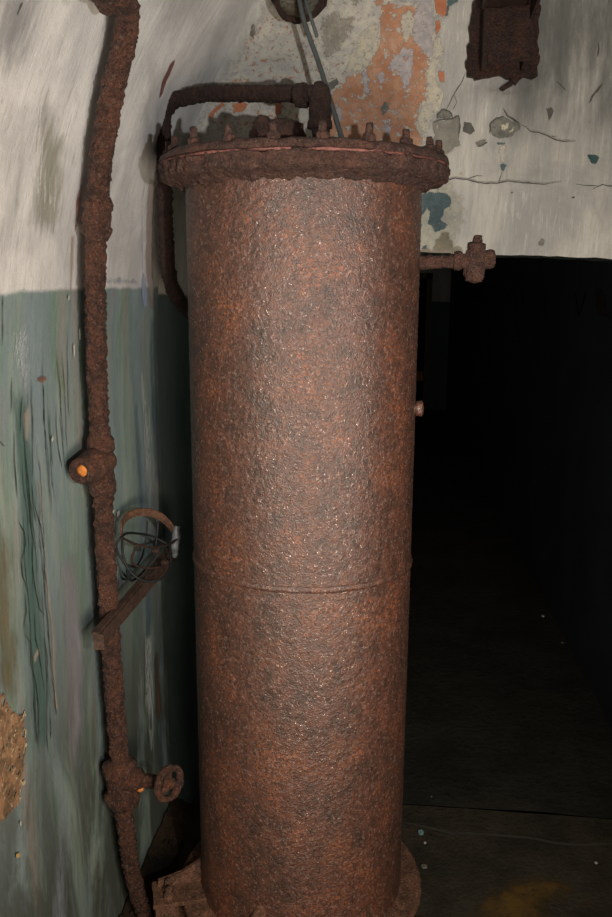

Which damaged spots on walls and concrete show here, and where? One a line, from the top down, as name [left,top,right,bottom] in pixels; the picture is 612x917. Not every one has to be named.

peeling [216,0,521,171]
peeling [197,102,312,142]
crack [503,109,576,142]
crack [437,174,612,193]
peeling [420,184,463,250]
peeling [0,692,27,822]